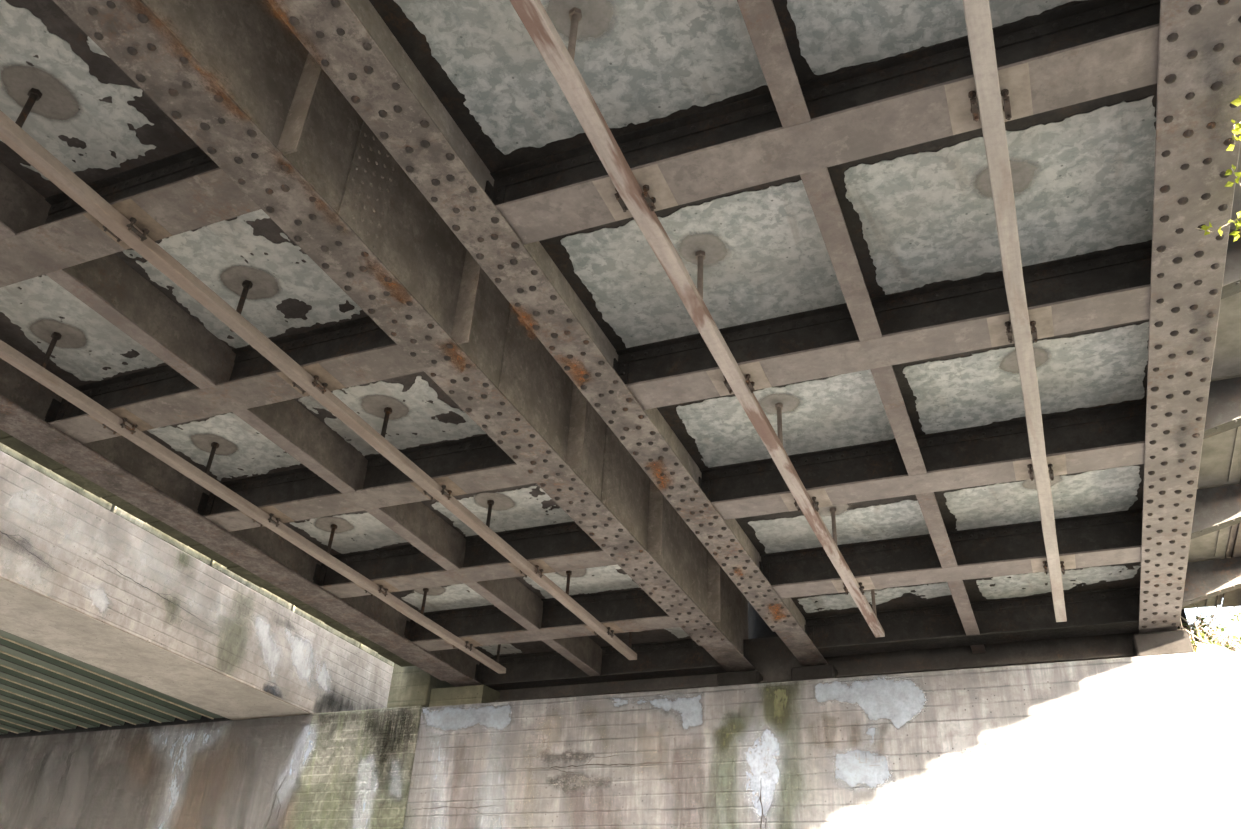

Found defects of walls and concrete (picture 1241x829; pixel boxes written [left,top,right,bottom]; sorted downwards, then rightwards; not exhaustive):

peeling [0,0,156,172]
peeling [393,0,585,155]
peeling [540,0,768,128]
peeling [123,249,249,348]
peeling [157,209,362,338]
peeling [298,376,486,456]
damp [355,729,401,829]
damp [716,720,739,749]
efflorescence [746,729,780,816]
flaking render [814,677,926,789]